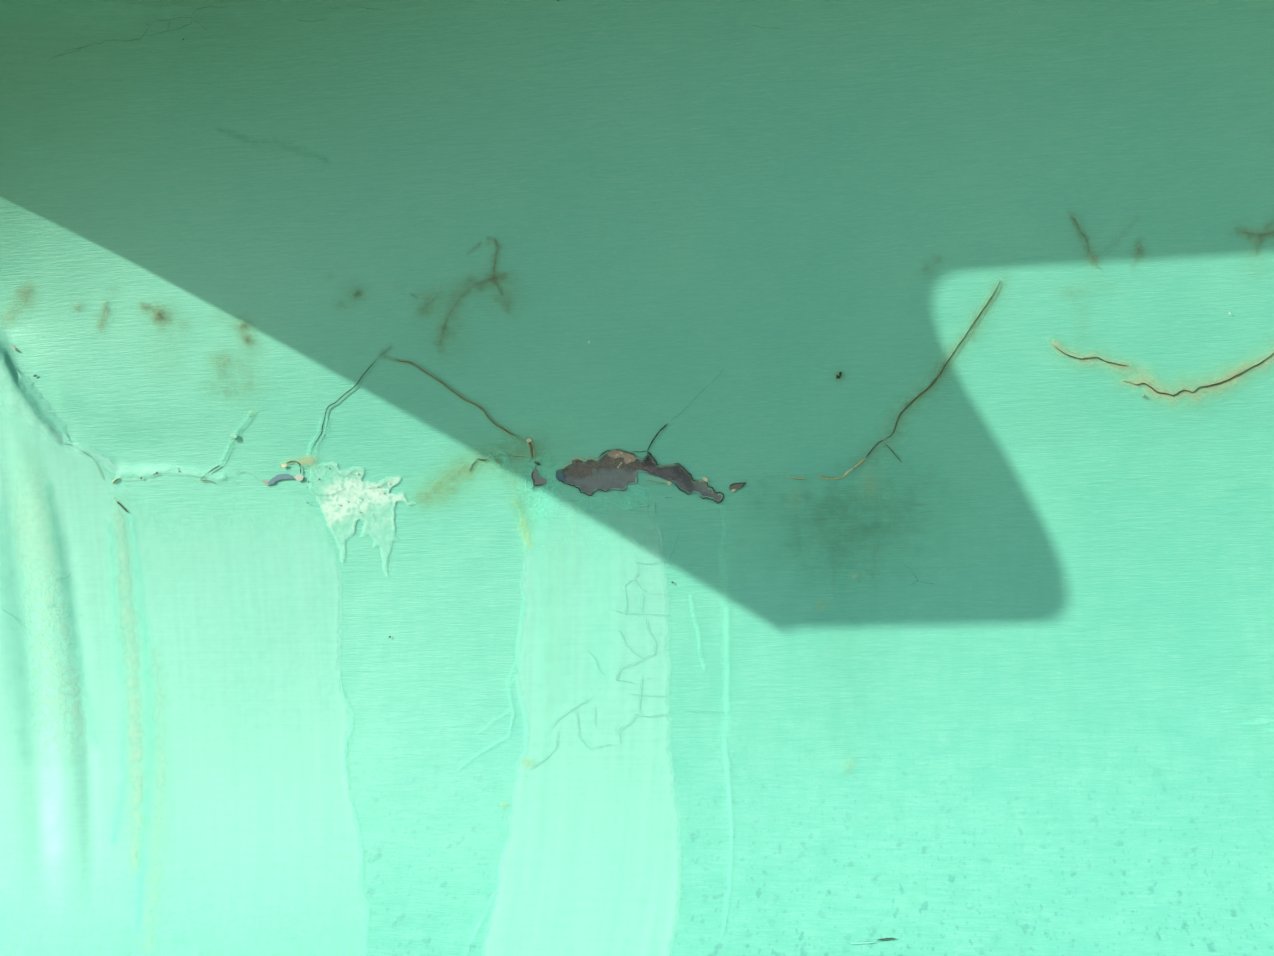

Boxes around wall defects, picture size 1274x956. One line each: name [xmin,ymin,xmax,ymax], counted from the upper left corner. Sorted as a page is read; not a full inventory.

crack [3,405,252,512]
crack [287,357,535,474]
peeling [521,449,746,519]
crack [633,424,667,452]
crack [787,284,999,480]
crack [1052,341,1274,401]
damp [0,384,360,948]
damp [485,535,679,956]